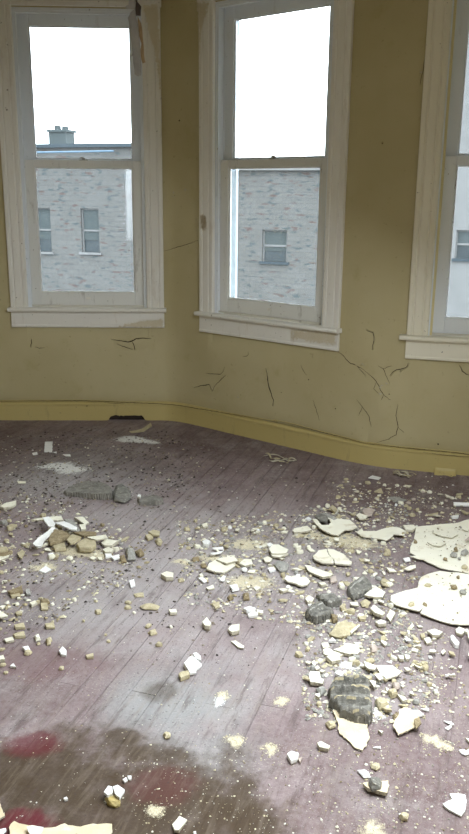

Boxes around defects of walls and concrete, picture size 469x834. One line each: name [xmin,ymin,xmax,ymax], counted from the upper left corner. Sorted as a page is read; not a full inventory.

crack [111,337,151,350]
crack [0,353,469,457]